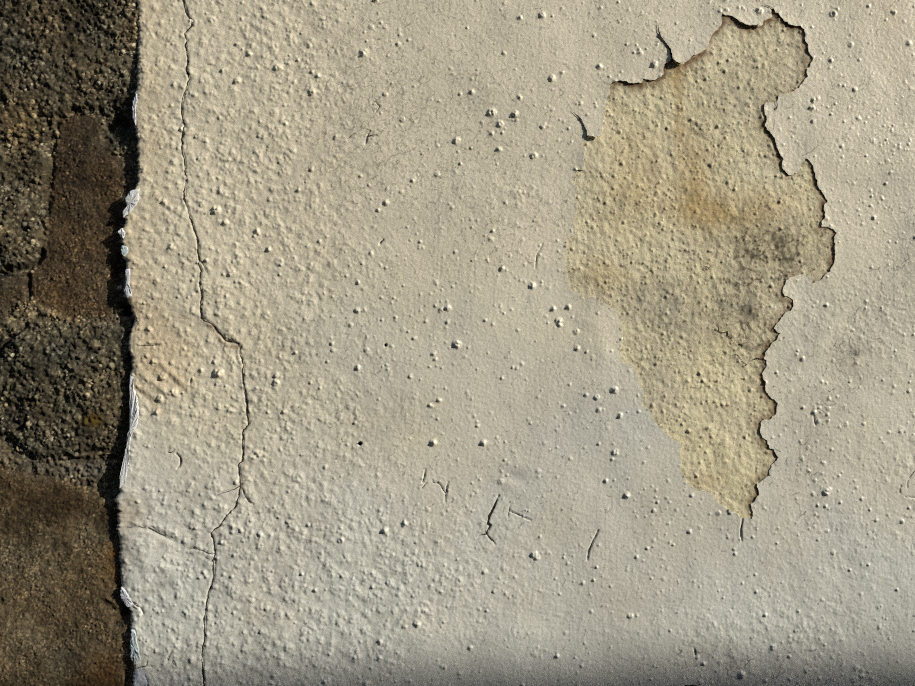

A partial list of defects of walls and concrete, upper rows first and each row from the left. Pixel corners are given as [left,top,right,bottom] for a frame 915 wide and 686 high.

crack [181,0,249,686]
crack [480,496,529,542]
peeling [565,5,836,525]